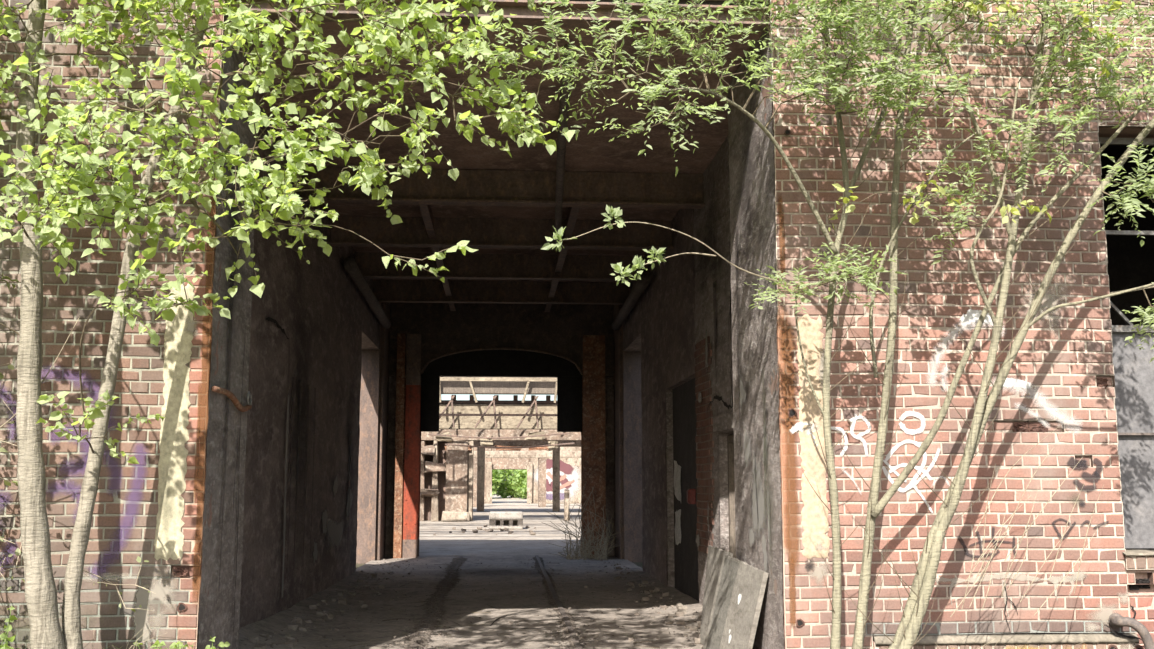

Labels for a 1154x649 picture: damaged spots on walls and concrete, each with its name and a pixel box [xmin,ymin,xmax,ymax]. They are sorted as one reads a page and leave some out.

corrosion [778,315,799,625]